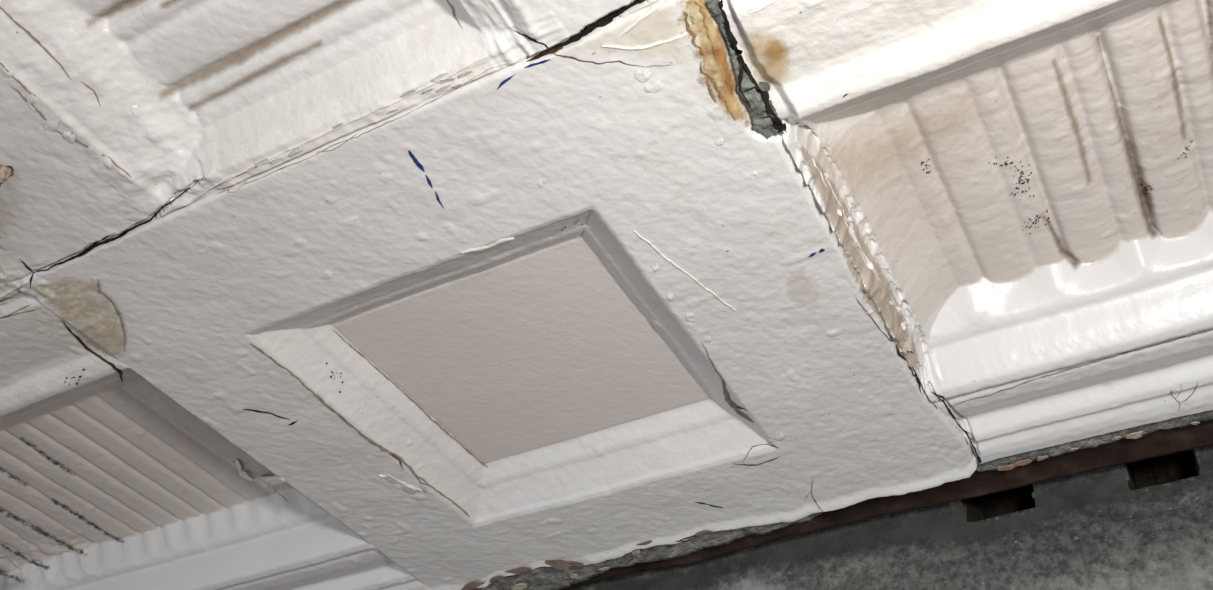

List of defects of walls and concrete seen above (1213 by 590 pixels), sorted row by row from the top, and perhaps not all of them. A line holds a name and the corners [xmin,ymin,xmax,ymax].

crack [0,7,101,106]
crack [0,62,131,177]
crack [21,0,666,288]
rust [679,0,749,124]
rust [753,41,785,78]
spalling [0,280,126,355]
peeling [800,148,918,368]
crack [855,297,1213,464]